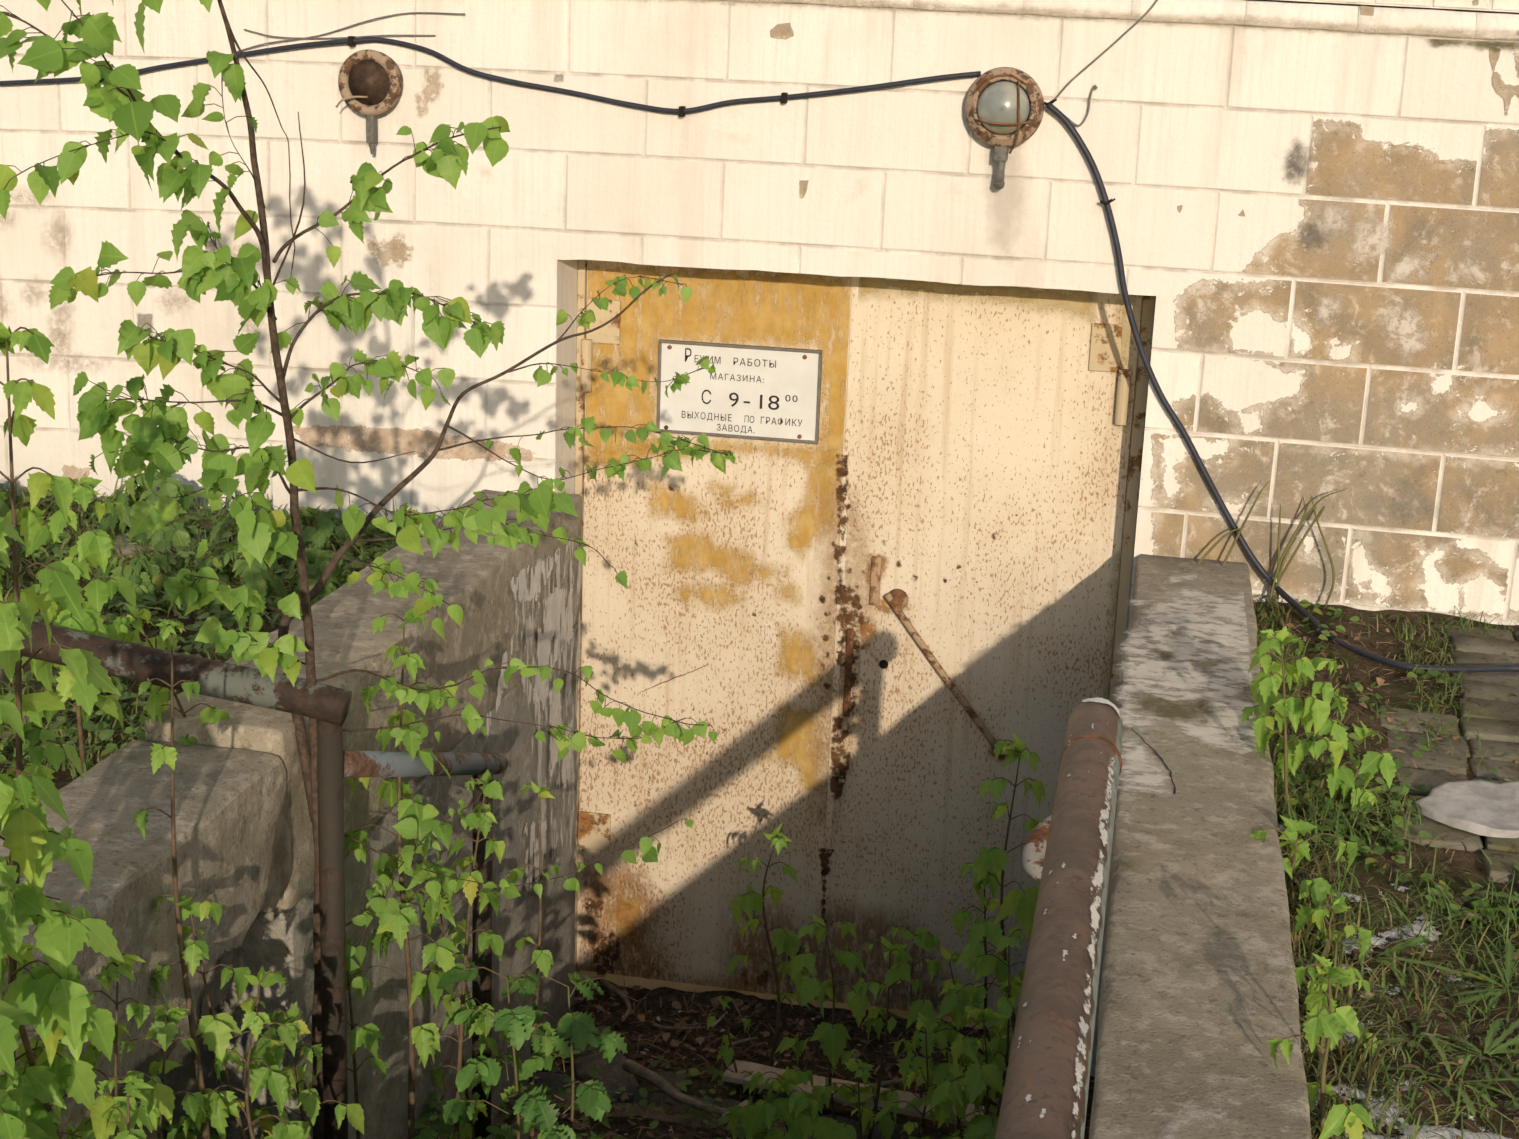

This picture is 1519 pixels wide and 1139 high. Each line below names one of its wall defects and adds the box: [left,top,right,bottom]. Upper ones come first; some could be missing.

peeling [1360,6,1374,16]
peeling [484,537,582,894]
peeling [650,488,771,606]
peeling [769,709,820,786]
peeling [780,633,814,681]
peeling [585,266,1091,551]
corrosion [819,455,918,799]
peeling [1062,48,1519,1138]